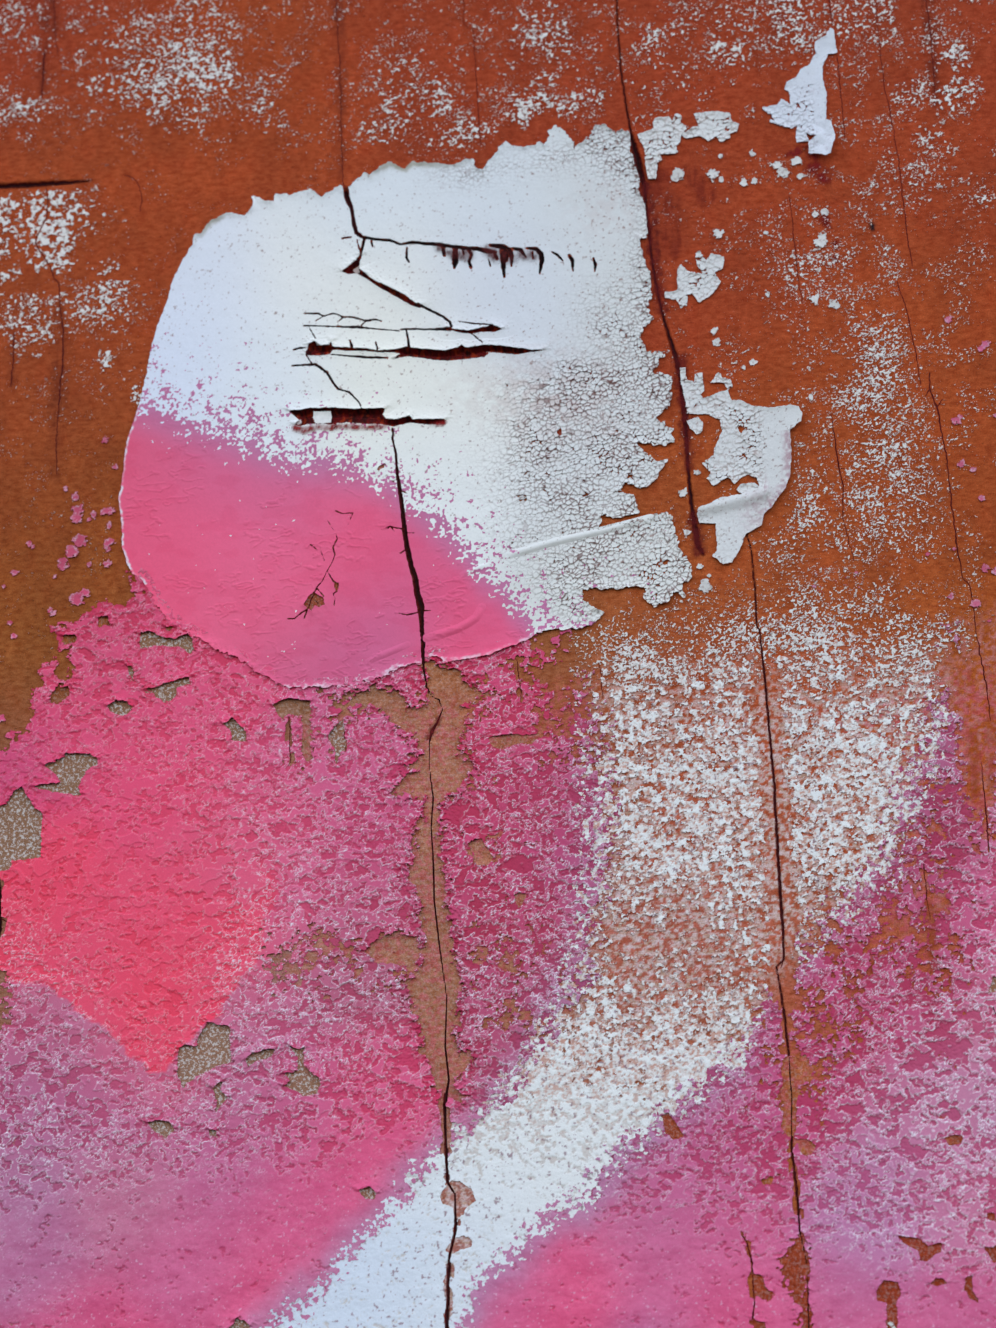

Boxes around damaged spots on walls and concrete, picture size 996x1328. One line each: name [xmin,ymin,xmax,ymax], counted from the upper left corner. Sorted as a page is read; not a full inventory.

corrosion [437,244,536,261]
corrosion [640,183,667,311]
crack [616,0,704,555]
corrosion [293,423,384,435]
corrosion [674,359,693,467]
peeling [0,753,98,871]
crack [388,429,458,1328]
crack [746,534,810,1328]
peeling [177,1022,321,1113]
crack [742,1235,755,1320]
peeling [750,1231,813,1328]
peeling [876,1280,901,1328]